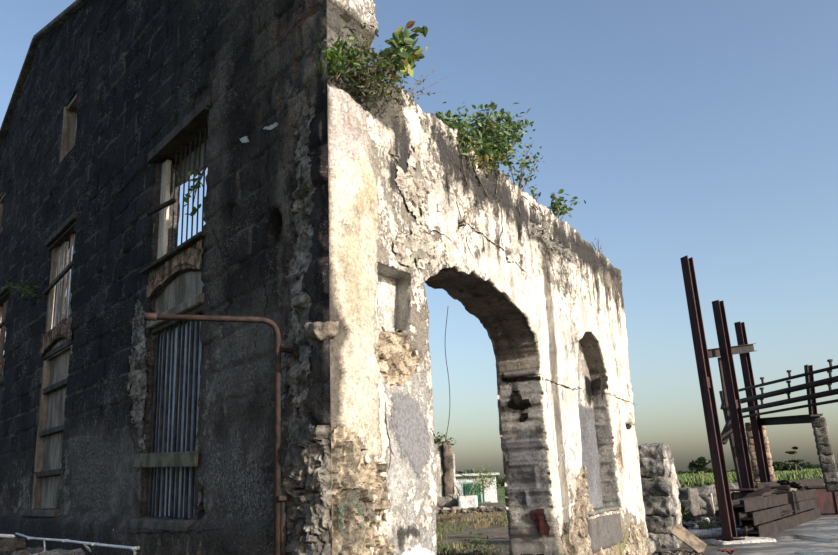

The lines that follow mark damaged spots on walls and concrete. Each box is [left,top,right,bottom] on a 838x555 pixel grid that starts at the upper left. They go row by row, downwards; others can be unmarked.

spalling [285,106,316,420]
damp [389,119,413,200]
peeling [388,142,442,270]
damp [430,126,545,241]
damp [553,224,619,311]
spalling [127,299,148,451]
spalling [373,326,420,389]
crack [502,376,583,411]
spalling [331,427,394,555]
spalling [561,465,649,555]